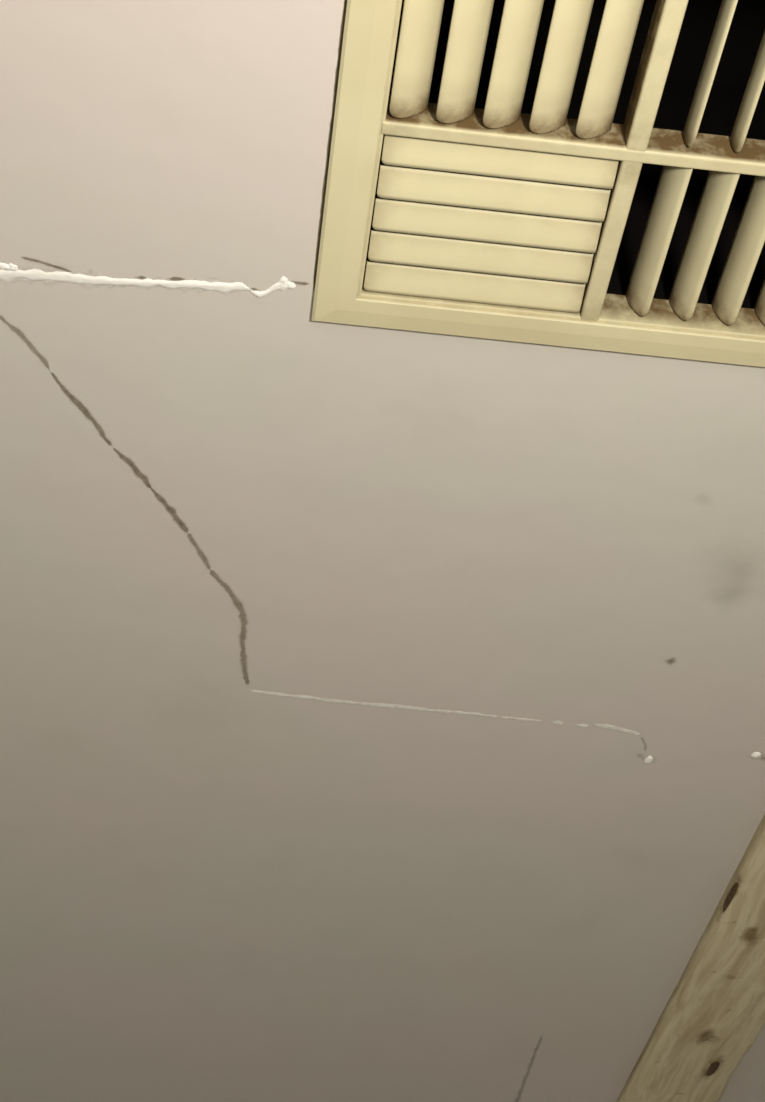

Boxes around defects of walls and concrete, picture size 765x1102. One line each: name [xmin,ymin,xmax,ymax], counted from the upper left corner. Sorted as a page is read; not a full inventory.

crack [0,257,308,297]
crack [0,316,640,736]